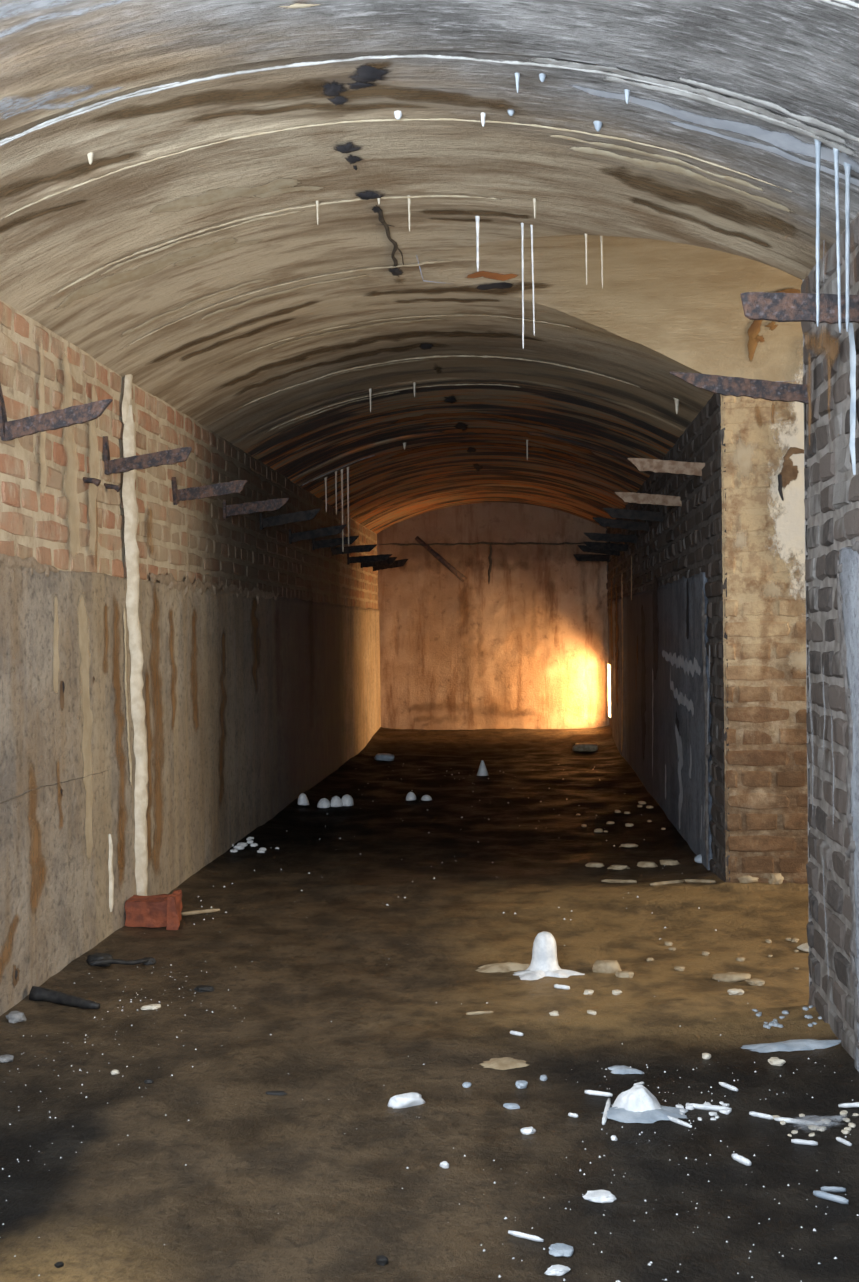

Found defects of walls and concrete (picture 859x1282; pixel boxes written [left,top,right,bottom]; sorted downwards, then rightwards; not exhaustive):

damp [0,54,859,248]
damp [52,178,529,309]
crack [376,205,404,268]
damp [39,431,47,493]
damp [61,355,72,409]
damp [64,419,99,557]
peeling [765,401,806,600]
damp [848,323,856,475]
damp [78,596,93,859]
damp [122,374,148,896]
peeling [789,651,806,671]